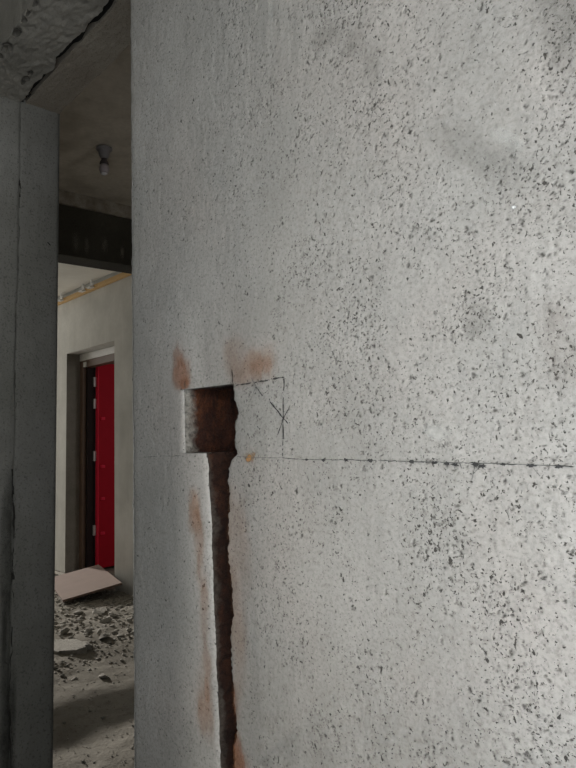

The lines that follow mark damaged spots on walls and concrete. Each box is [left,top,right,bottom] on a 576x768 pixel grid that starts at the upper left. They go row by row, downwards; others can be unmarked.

crack [9,469,17,603]